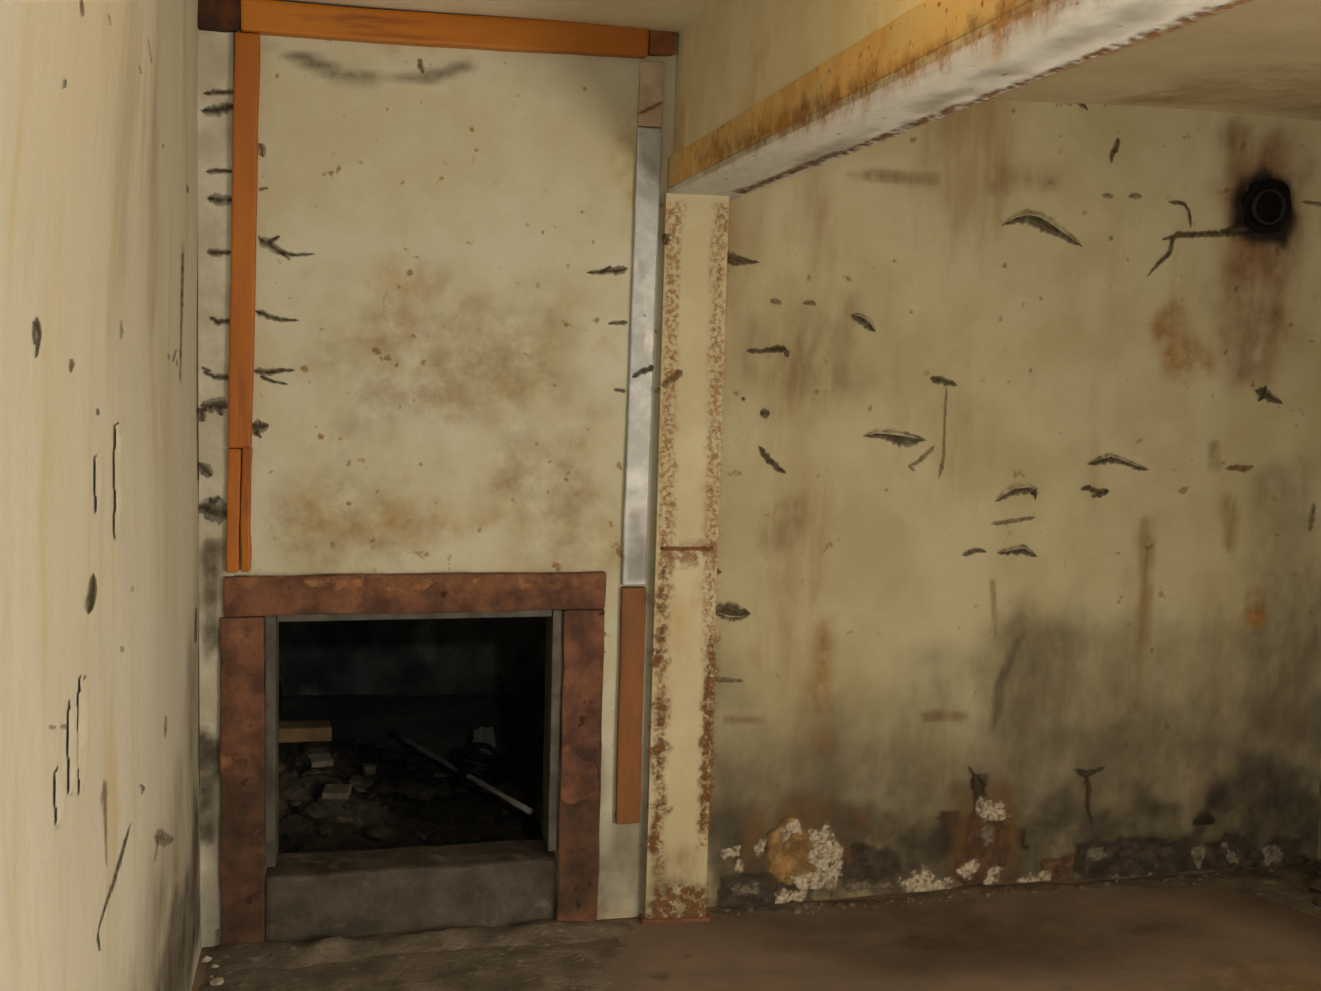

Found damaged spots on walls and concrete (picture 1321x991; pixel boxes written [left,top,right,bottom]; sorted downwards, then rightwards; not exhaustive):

corrosion [719,0,1252,194]
crack [1102,195,1250,274]
corrosion [648,204,728,868]
crack [97,784,174,951]
water stain [158,733,220,991]
corrosion [645,884,711,919]
water stain [713,773,981,893]
water stain [970,772,1127,885]